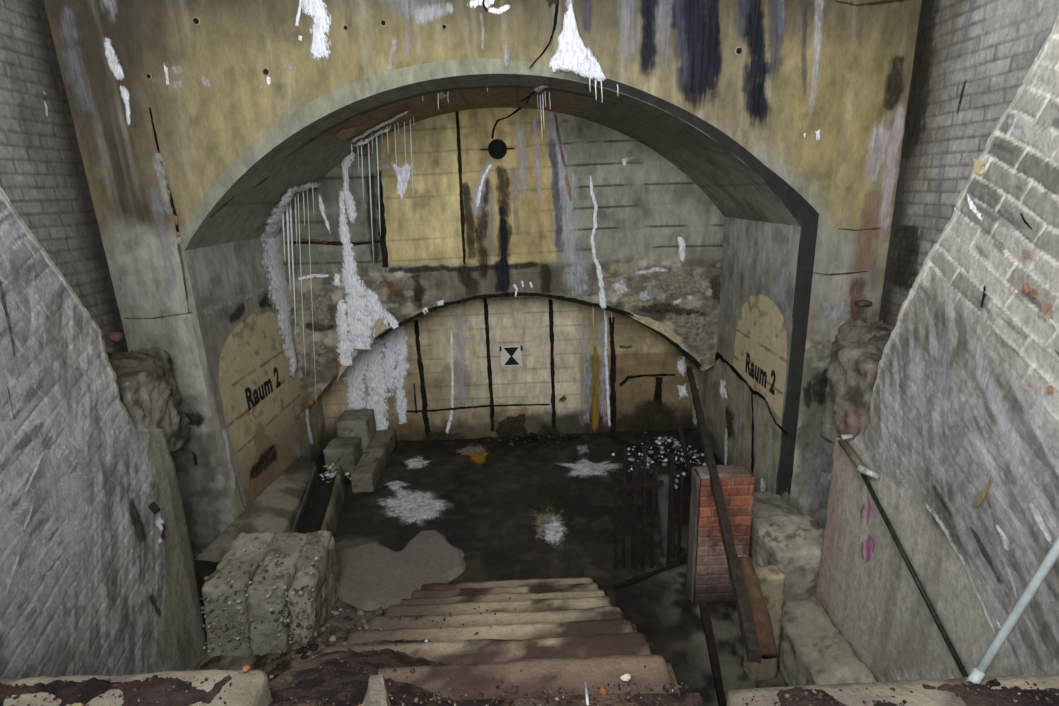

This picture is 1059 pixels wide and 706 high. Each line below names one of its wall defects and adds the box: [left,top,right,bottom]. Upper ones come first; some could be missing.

efflorescence [295,0,332,59]
crack [491,0,590,139]
efflorescence [549,0,606,99]
damp [641,0,722,106]
damp [737,0,784,123]
spalling [295,273,347,420]
damp [260,153,410,431]
peeling [370,318,386,338]
damp [458,113,612,430]
spalling [612,280,627,295]
spalling [629,267,721,360]
crack [715,352,787,474]